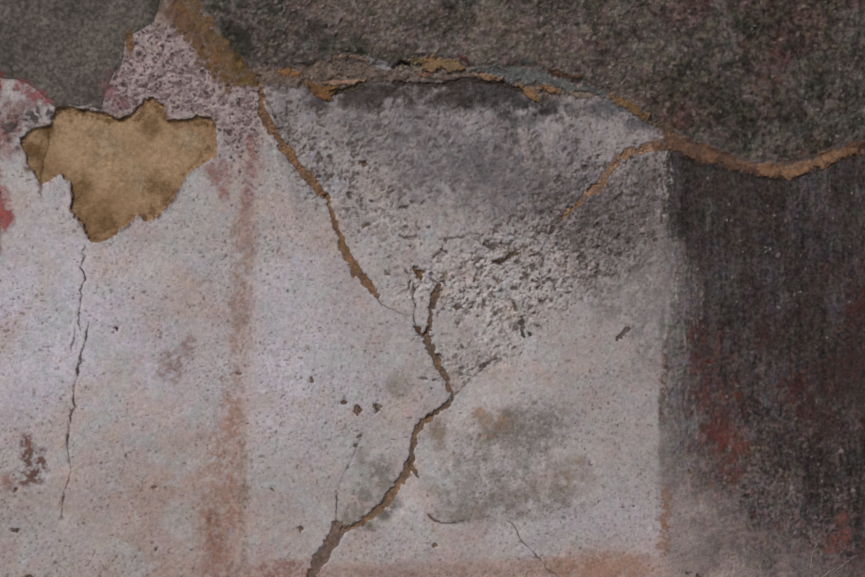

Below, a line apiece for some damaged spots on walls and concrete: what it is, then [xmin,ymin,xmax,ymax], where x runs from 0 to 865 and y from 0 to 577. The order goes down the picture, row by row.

crack [61,246,89,515]
spalling [1,24,592,242]
crack [256,75,501,577]
leakage [338,80,568,125]
crack [490,251,519,264]
spalling [387,156,655,338]
crack [537,132,865,235]
crack [509,521,558,576]